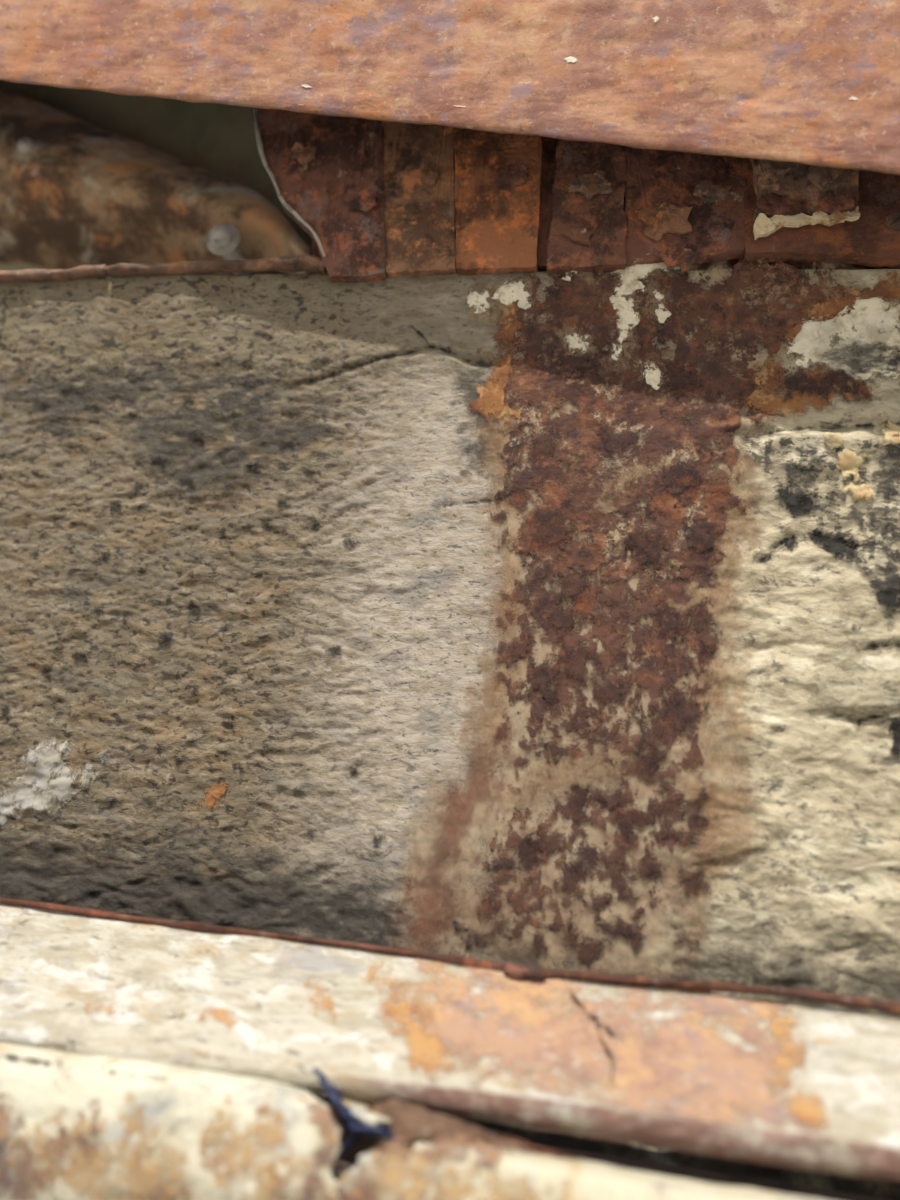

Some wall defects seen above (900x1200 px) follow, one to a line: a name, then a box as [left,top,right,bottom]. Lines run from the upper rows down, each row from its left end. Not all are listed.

corrosion [291,142,317,164]
corrosion [568,170,612,202]
corrosion [750,158,861,240]
crack [297,327,493,390]
peeling [787,297,900,384]
peeling [879,420,900,445]
peeling [775,432,874,518]
water stain [742,431,900,619]
spalling [785,528,858,560]
corrosion [368,180,900,1133]